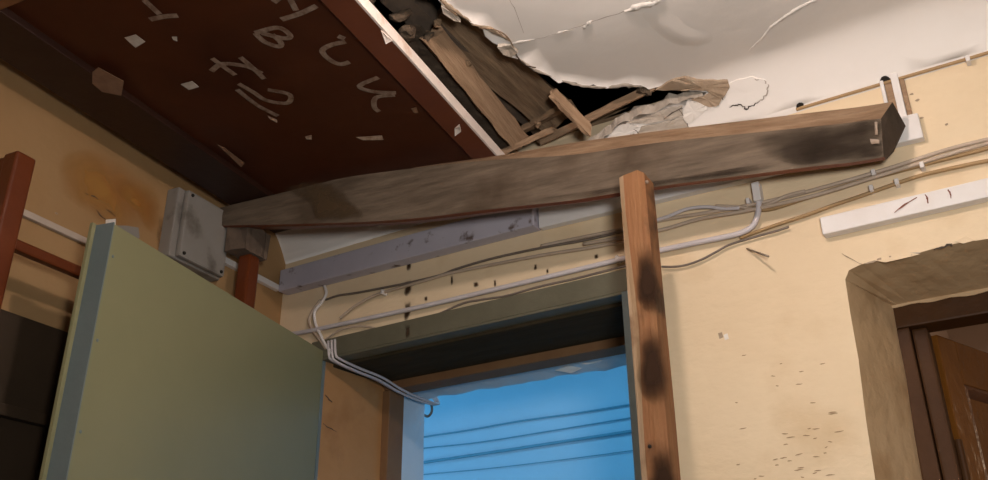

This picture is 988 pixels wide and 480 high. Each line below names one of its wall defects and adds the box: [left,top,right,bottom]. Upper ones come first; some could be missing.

flaking render [441,4,461,22]
flaking render [497,43,519,57]
spalling [607,76,769,138]